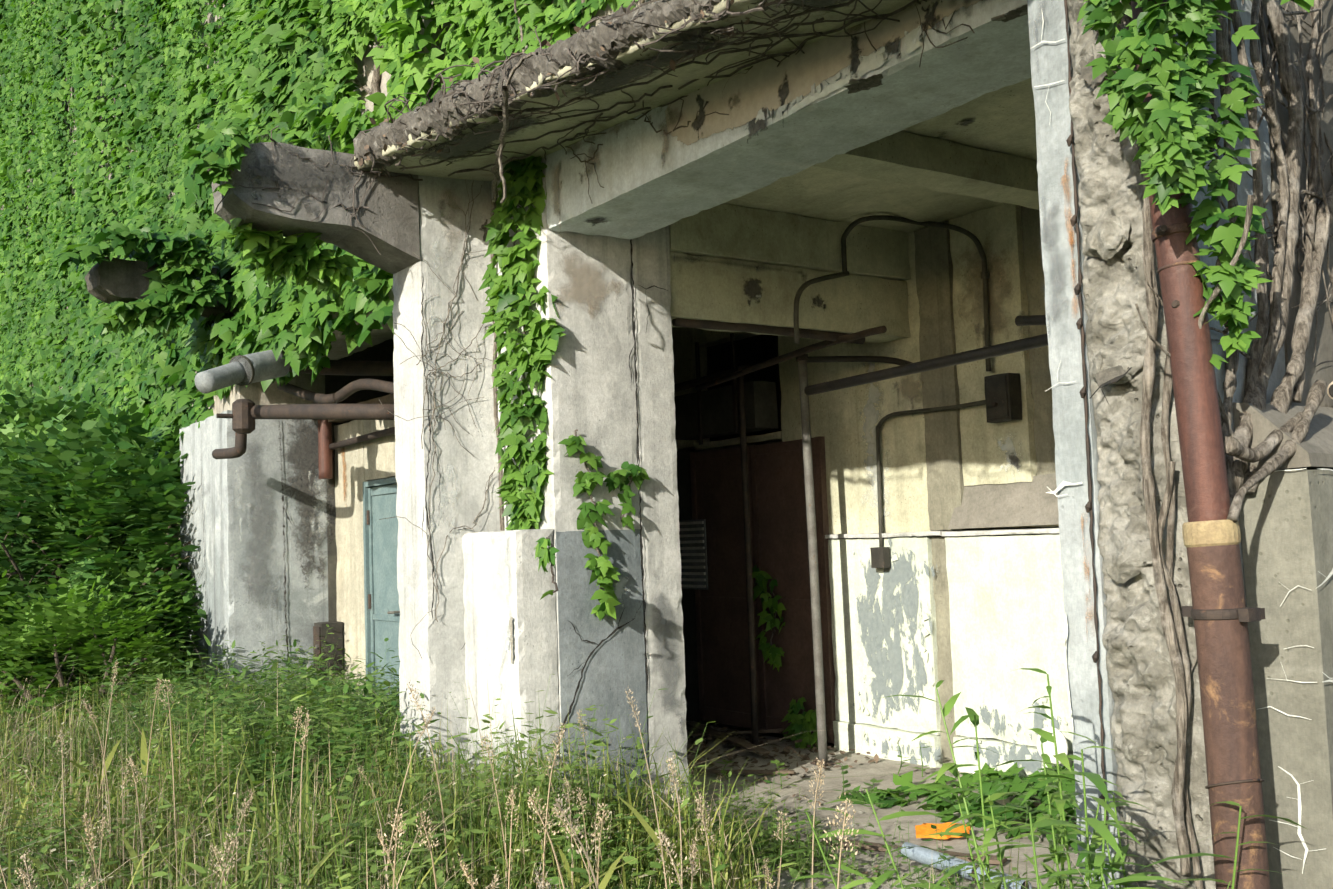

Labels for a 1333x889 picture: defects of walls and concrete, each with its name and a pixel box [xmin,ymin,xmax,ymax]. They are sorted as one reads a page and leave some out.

flaking render [665,0,981,146]
spalling [991,5,1028,22]
water stain [247,419,336,603]
crack [558,239,668,735]
peeling [850,537,941,765]
crack [1260,645,1333,720]
crack [1279,569,1333,606]
crack [1270,766,1323,874]